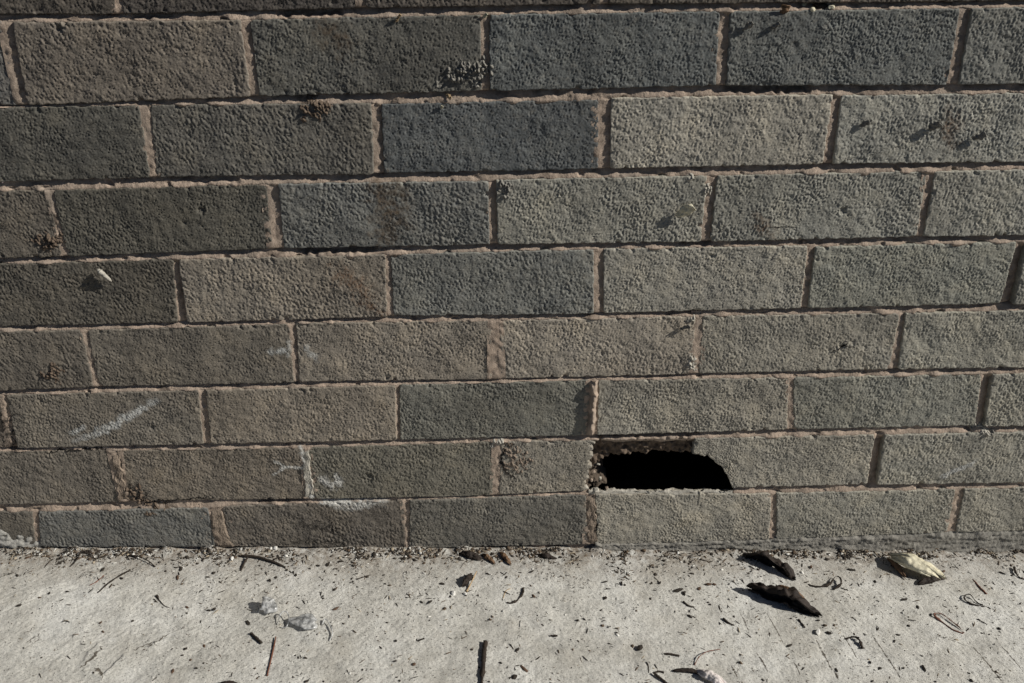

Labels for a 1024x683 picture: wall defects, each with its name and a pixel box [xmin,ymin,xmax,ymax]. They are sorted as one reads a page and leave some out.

spalling [585,450,733,543]